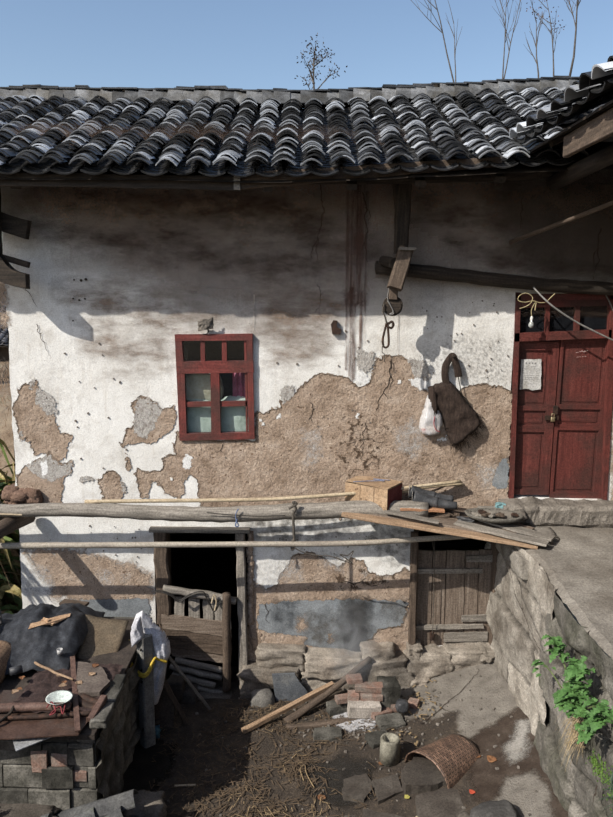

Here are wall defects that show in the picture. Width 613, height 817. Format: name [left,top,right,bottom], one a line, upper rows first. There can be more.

corrosion [345,184,367,378]
peeling [12,378,82,503]
peeling [79,340,512,509]
crack [342,361,393,472]
peeling [22,539,156,601]
peeling [246,549,410,661]